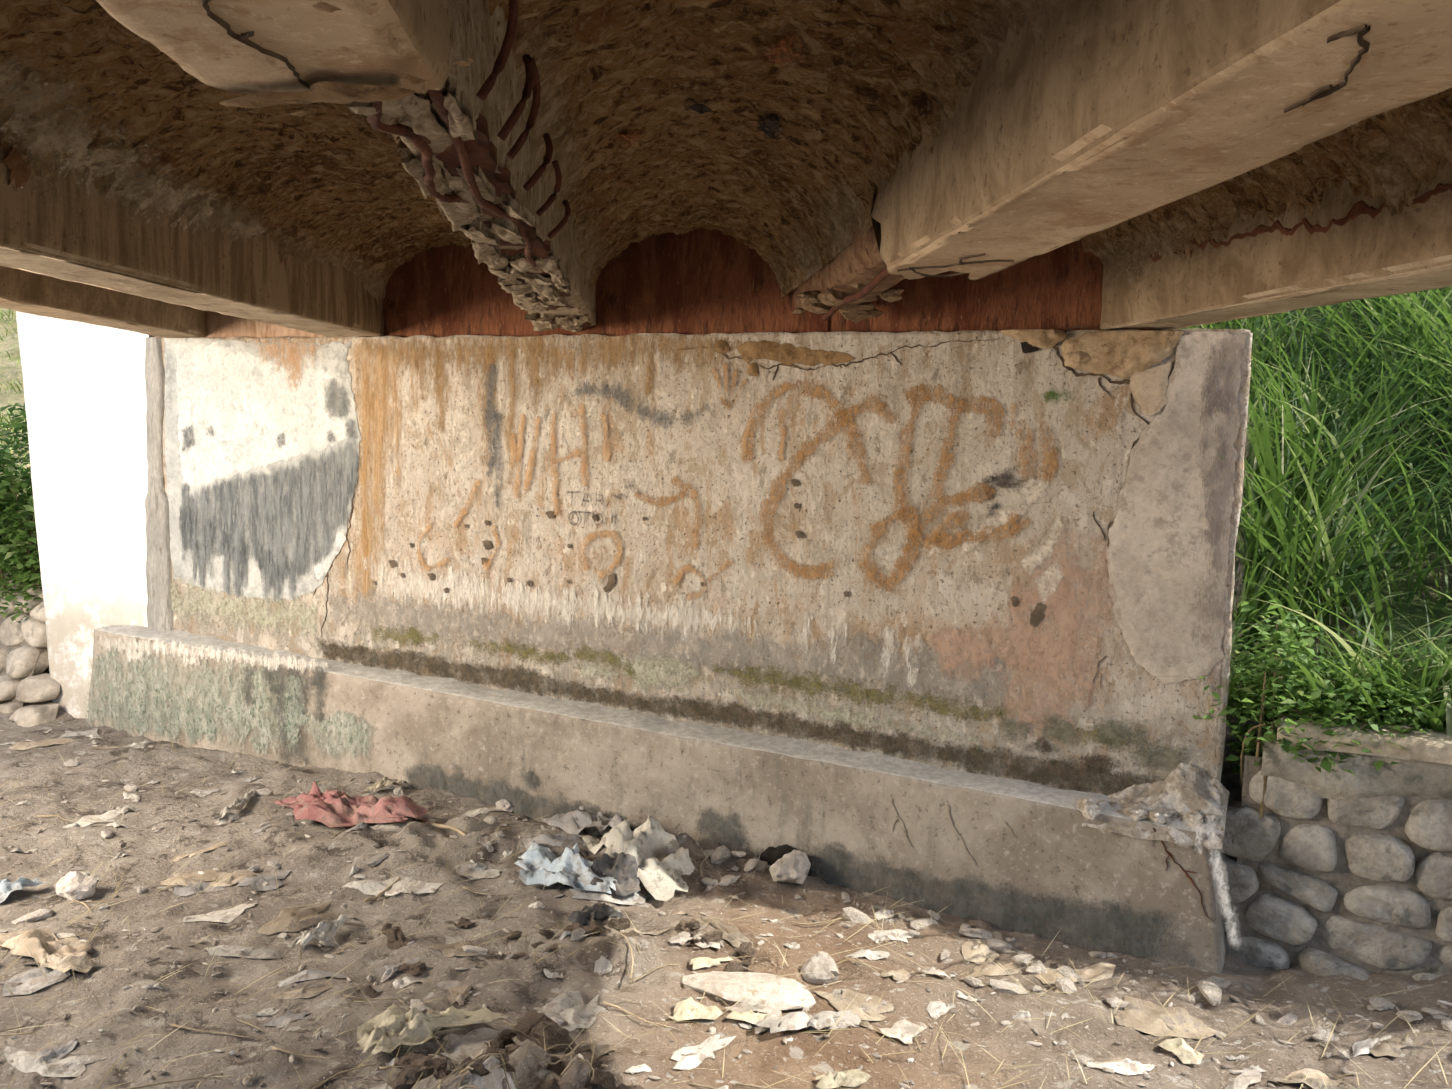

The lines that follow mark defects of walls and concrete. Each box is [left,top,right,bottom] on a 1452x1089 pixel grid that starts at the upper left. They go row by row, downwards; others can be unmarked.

crack [202,0,310,89]
crack [1284,23,1371,113]
spalling [219,0,593,332]
crack [897,253,1014,277]
crack [1150,183,1452,263]
spalling [1021,342,1040,353]
flaking render [163,338,361,601]
leakage [1193,344,1250,643]
leakage [328,559,1077,745]
leakage [245,656,326,764]
leakage [1097,720,1189,769]
spalling [1076,763,1229,849]